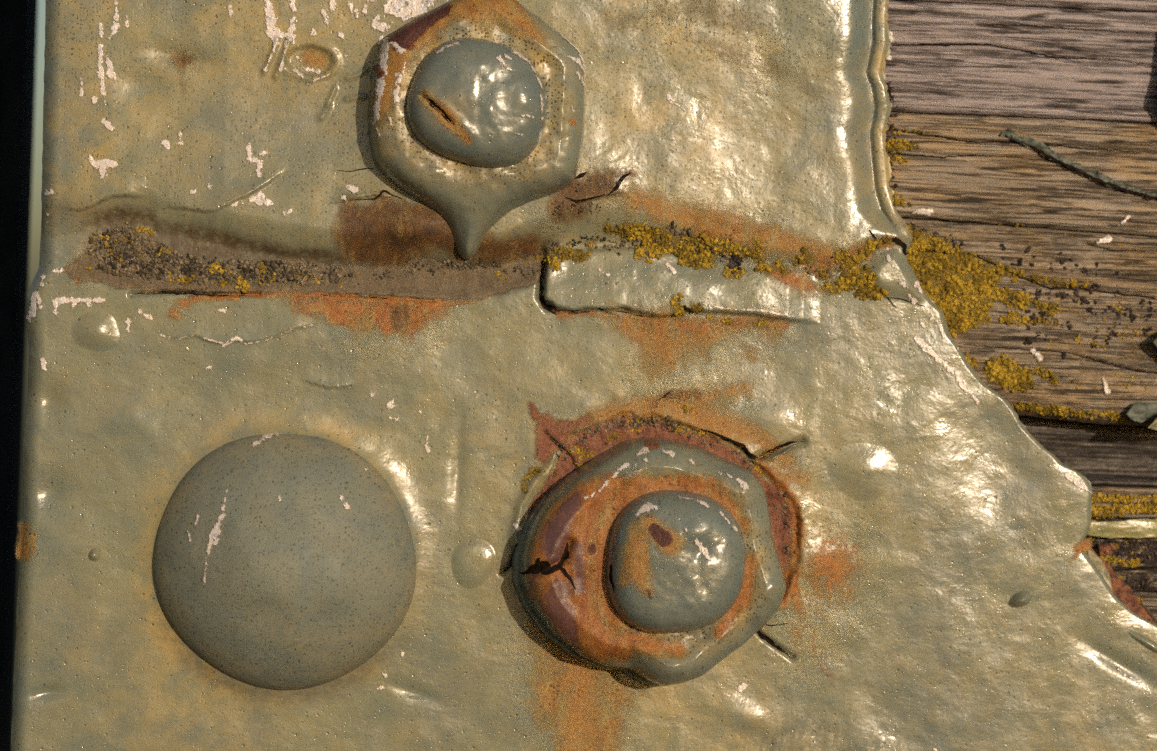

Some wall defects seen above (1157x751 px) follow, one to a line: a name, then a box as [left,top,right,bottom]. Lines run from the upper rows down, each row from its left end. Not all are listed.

peeling [79,0,129,104]
peeling [263,0,434,137]
rust [370,0,543,124]
peeling [88,154,118,182]
peeling [231,142,292,216]
rust [333,193,460,266]
rust [548,168,895,293]
rust [169,290,475,337]
crack [539,249,691,319]
peeling [886,254,980,405]
crack [701,429,804,479]
rust [524,383,861,751]